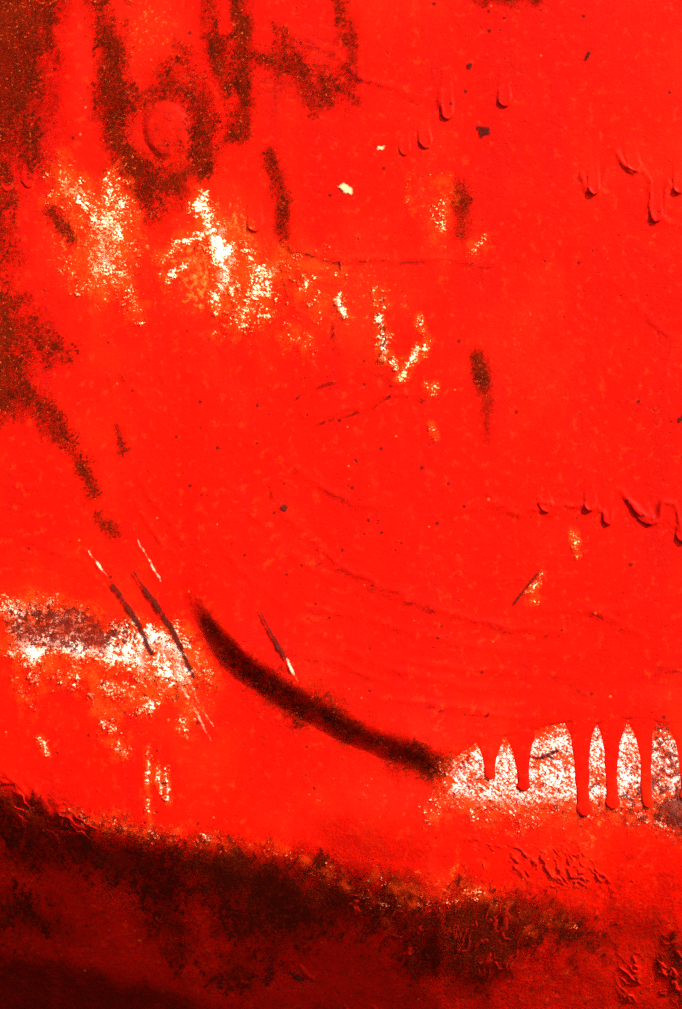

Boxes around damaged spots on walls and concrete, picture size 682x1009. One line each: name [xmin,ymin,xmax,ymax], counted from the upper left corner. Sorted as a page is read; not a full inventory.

rust [83,0,343,229]
rust [0,0,121,537]
peeling [42,151,147,327]
peeling [155,187,351,358]
rust [260,147,295,261]
peeling [370,282,431,382]
rust [470,348,493,389]
peeling [0,589,218,759]
rust [198,613,467,788]
peeling [0,721,682,990]